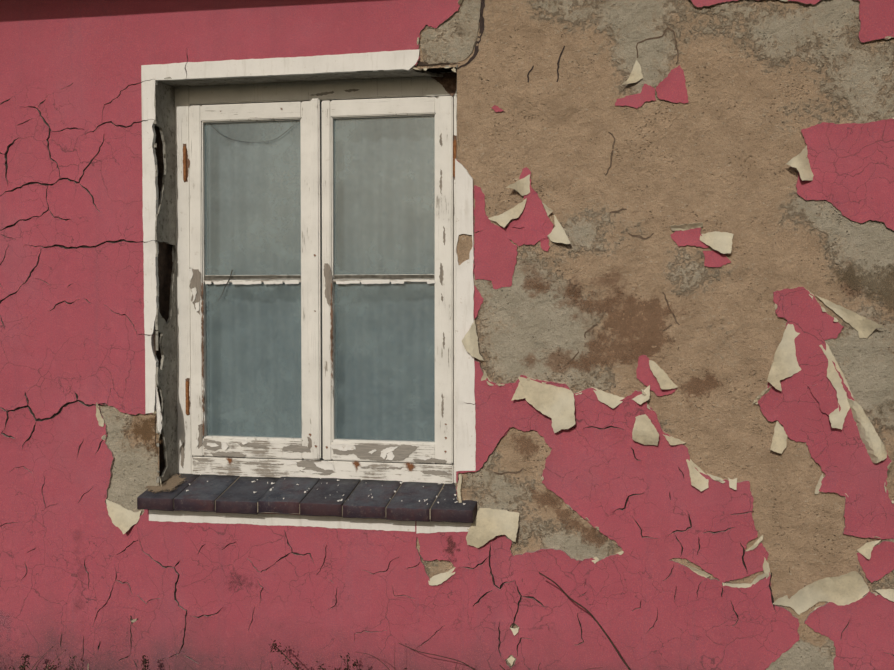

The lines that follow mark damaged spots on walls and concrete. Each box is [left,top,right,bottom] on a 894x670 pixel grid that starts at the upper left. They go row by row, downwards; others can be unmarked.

crack [0,80,157,324]
crack [52,284,153,336]
peeling [413,0,894,670]
peeling [96,386,165,534]
peeling [180,263,624,564]
crack [119,540,222,662]
crack [250,537,337,625]
crack [466,545,543,656]
crack [614,493,754,634]
crack [768,572,776,610]